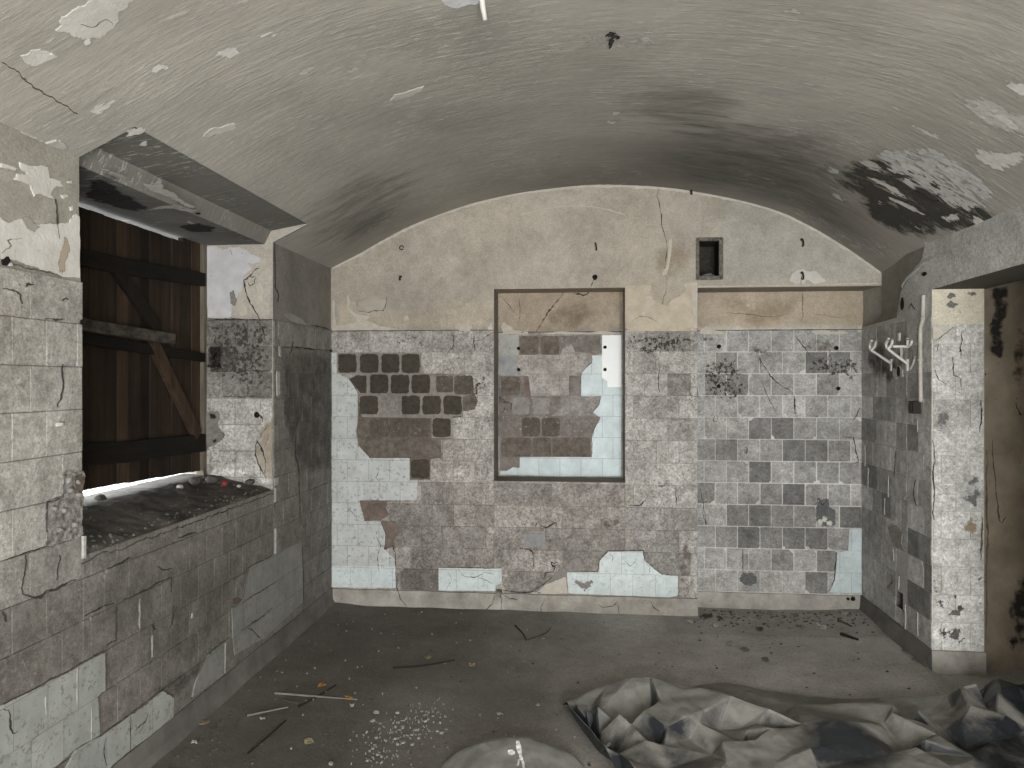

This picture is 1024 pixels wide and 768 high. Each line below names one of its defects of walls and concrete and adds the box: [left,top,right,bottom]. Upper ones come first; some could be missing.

peeling [55,0,133,46]
crack [2,62,77,114]
peeling [963,96,1024,171]
peeling [0,162,80,278]
peeling [207,246,265,318]
crack [500,273,597,331]
spalling [332,184,881,476]
water stain [990,287,1023,375]
water stain [706,358,745,399]
spalling [332,353,478,588]
crack [3,546,77,599]
peeling [438,550,678,597]